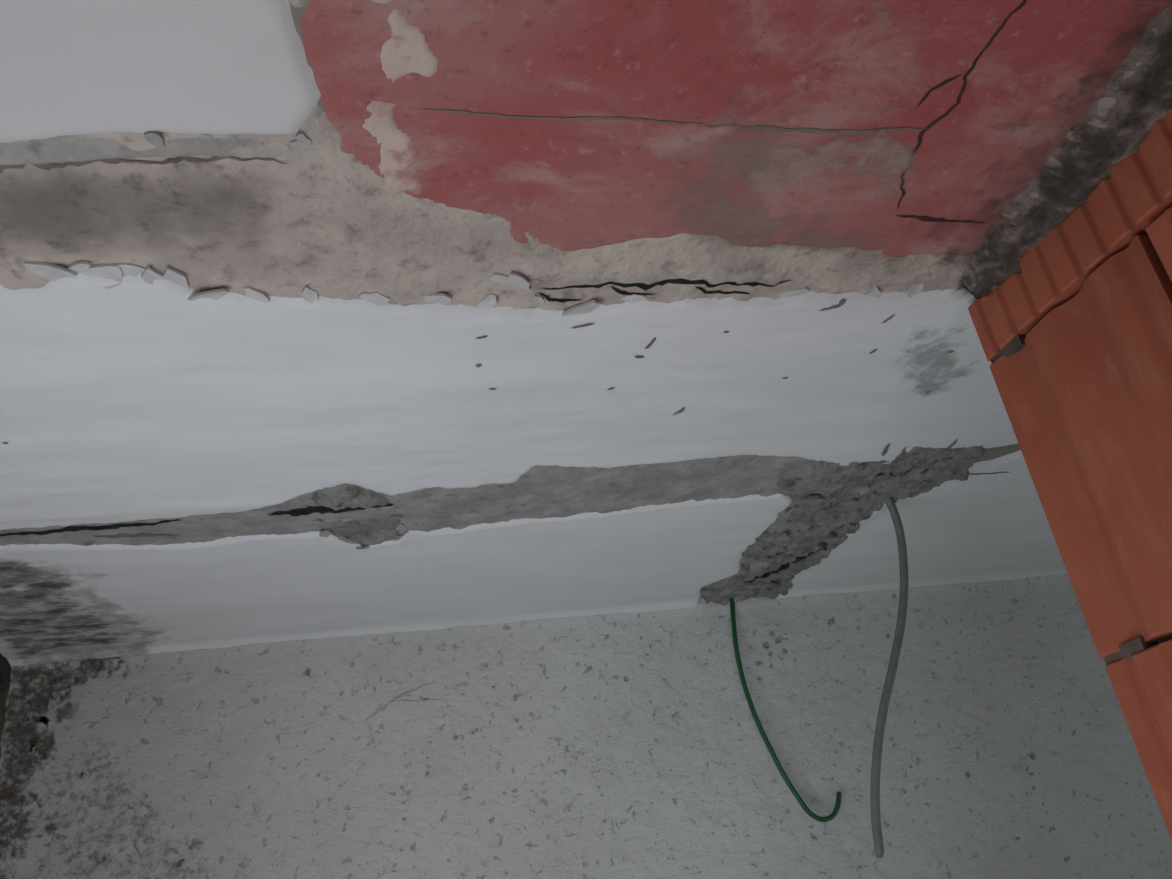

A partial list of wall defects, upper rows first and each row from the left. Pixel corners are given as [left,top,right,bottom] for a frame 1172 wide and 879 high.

peeling [372,0,438,83]
peeling [0,100,967,329]
crack [416,0,1027,223]
peeling [0,439,1011,605]
damp [0,563,127,858]